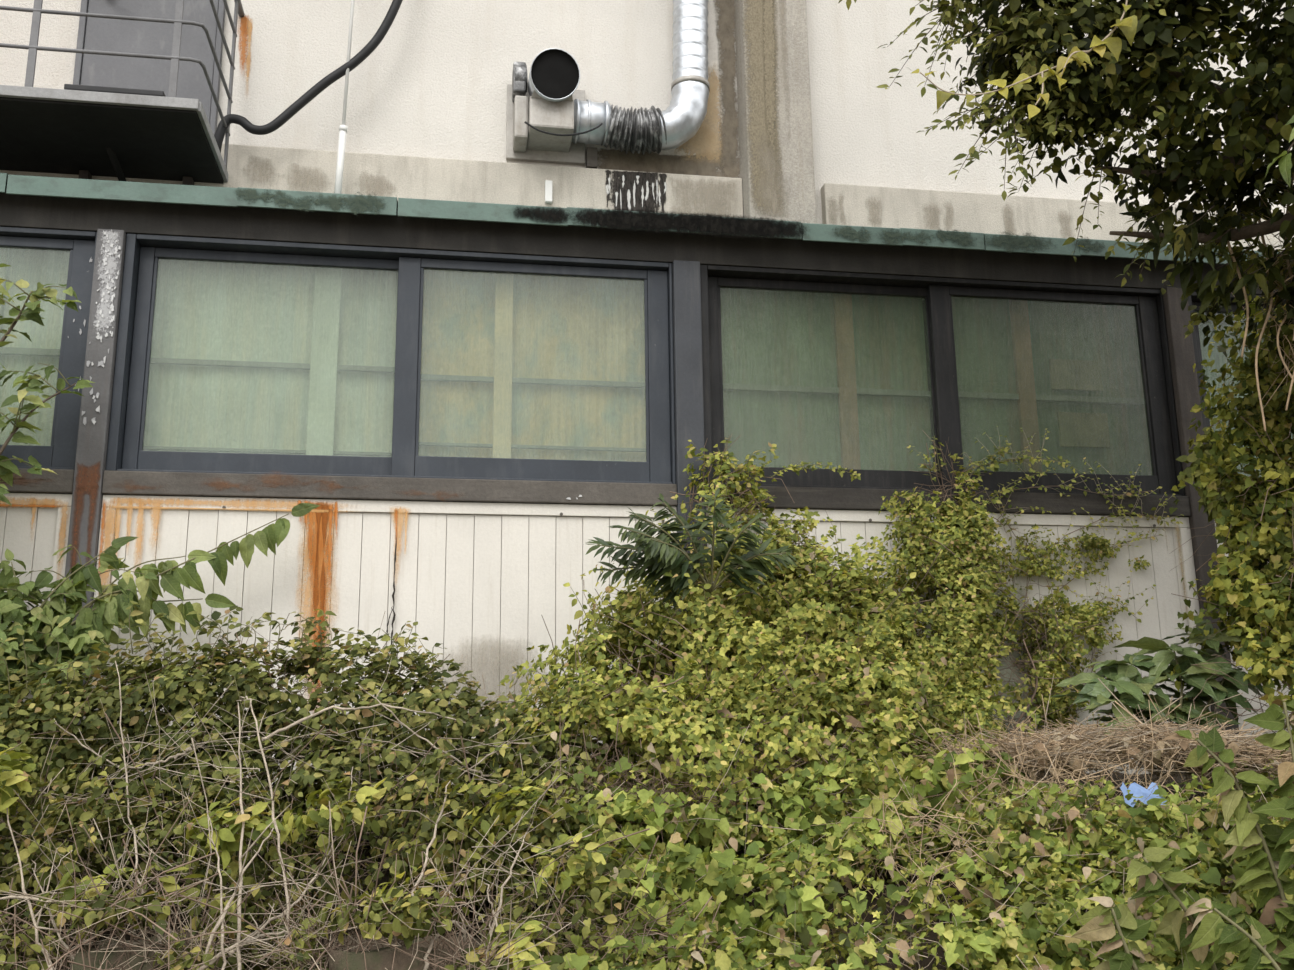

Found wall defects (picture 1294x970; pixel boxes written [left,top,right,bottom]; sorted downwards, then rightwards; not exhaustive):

rust [239,16,252,77]
leakage [514,0,803,238]
peeling [68,229,121,424]
rust [0,462,347,699]
rust [394,508,407,562]